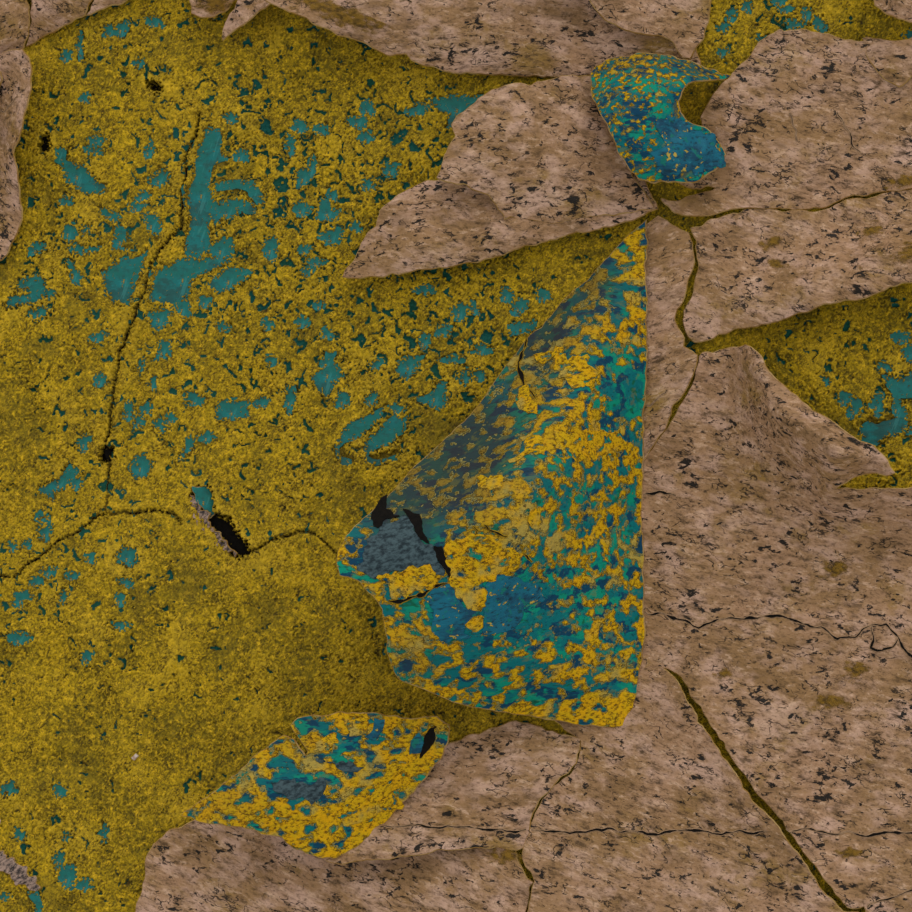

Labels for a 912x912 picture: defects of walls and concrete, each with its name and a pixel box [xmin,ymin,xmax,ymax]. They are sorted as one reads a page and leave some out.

peeling [6,274,57,322]
peeling [0,0,131,261]
crack [104,115,200,489]
peeling [54,111,265,391]
peeling [189,0,711,279]
peeling [660,6,912,343]
crack [0,515,100,578]
peeling [135,215,912,912]
crack [645,611,912,659]
peeling [51,830,95,893]
crack [383,823,912,838]
crack [867,889,912,908]